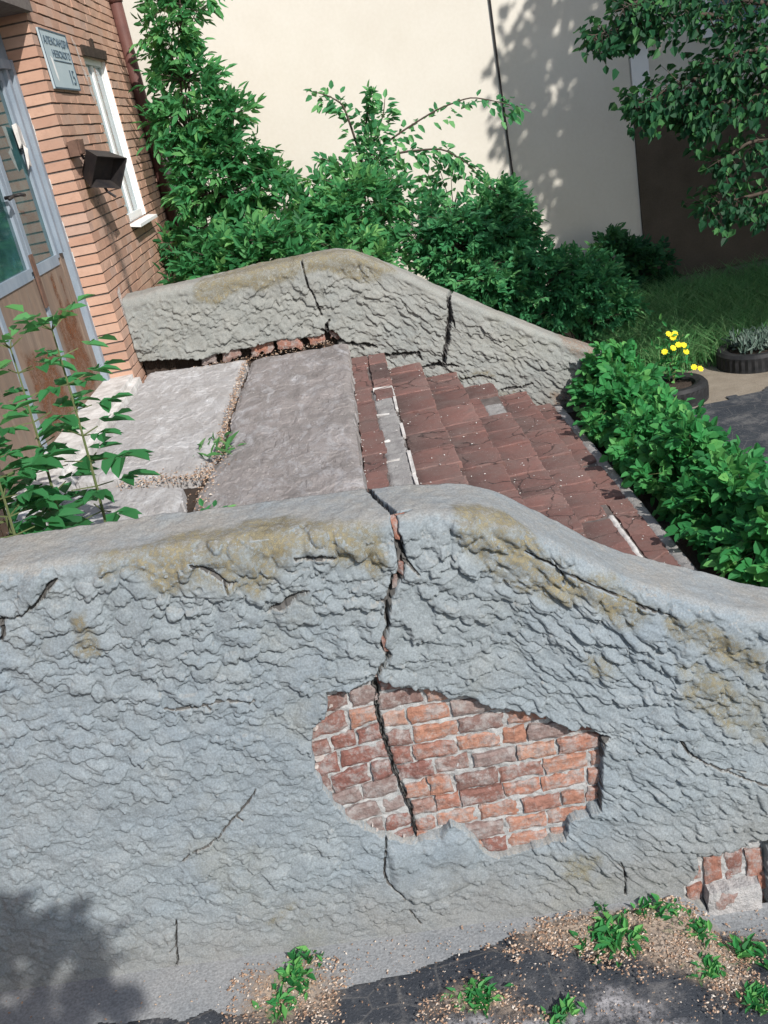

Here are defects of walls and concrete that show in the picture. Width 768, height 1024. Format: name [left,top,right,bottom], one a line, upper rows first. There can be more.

crack [301,262,532,391]
crack [0,578,57,639]
crack [366,489,419,677]
spalling [312,677,600,851]
crack [183,789,256,861]
crack [383,837,421,924]
spalling [684,840,766,915]